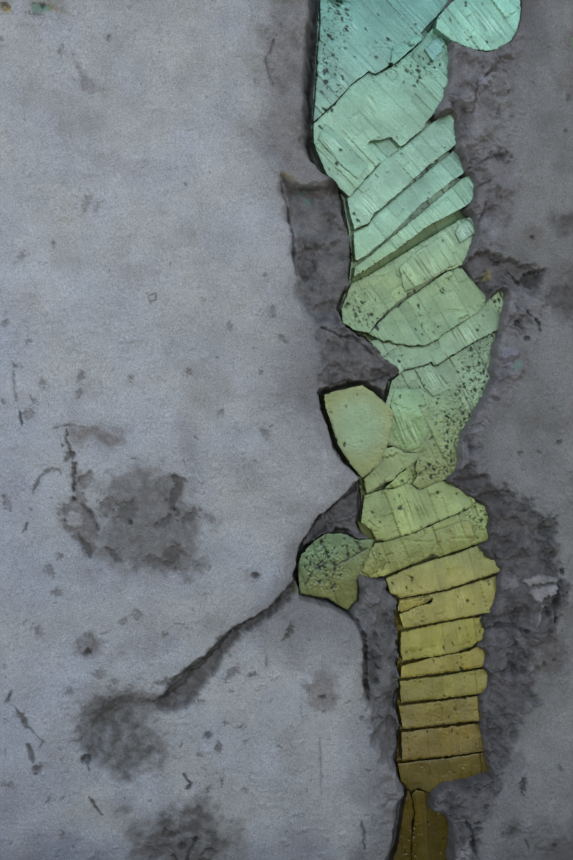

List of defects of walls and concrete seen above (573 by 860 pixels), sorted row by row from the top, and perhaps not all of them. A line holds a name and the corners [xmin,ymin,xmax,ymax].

spalling [246,0,399,401]
leakage [63,677,181,794]
crack [85,539,369,719]
spalling [292,486,367,578]
spalling [334,574,404,860]
spalling [429,20,571,771]